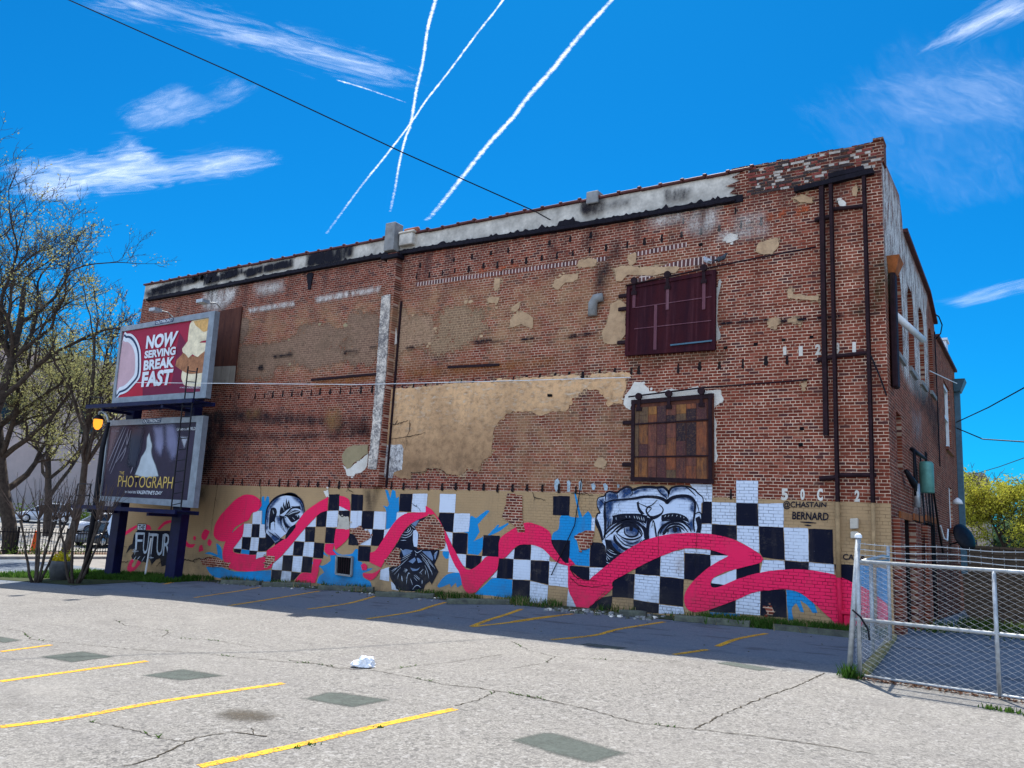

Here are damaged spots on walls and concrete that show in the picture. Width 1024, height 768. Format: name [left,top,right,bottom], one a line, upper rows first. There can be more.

damp [306,246,352,266]
damp [146,259,292,309]
damp [317,287,379,301]
peeling [343,454,368,478]
peeling [384,444,403,478]
peeling [502,493,525,532]
peeling [415,514,445,550]